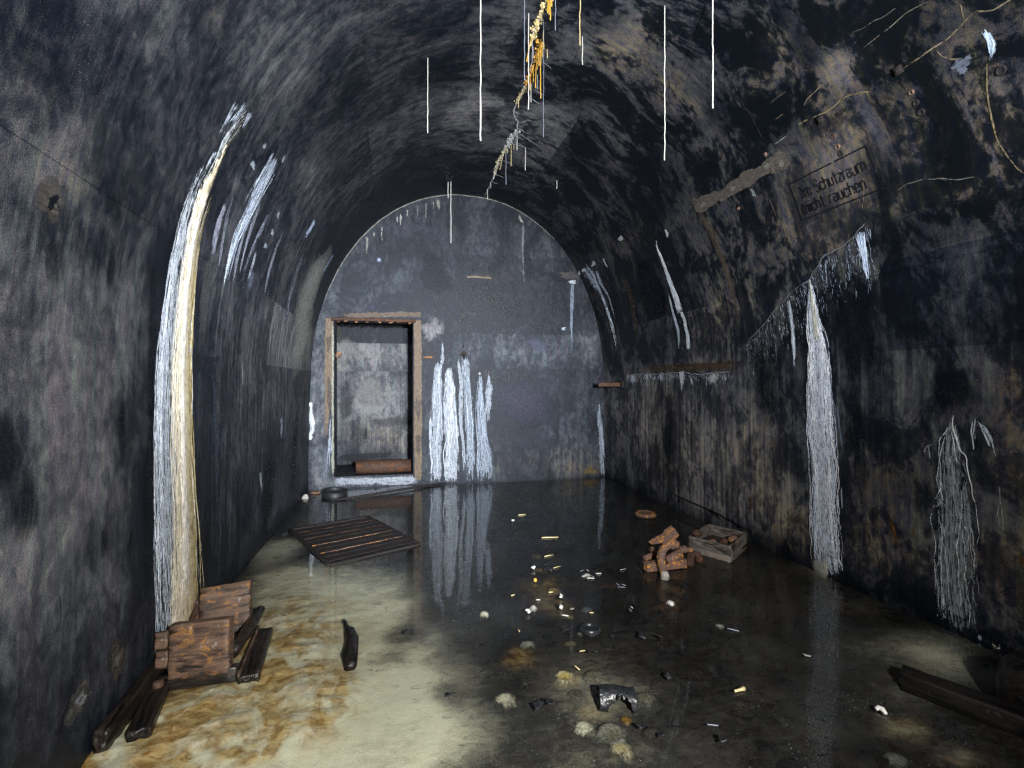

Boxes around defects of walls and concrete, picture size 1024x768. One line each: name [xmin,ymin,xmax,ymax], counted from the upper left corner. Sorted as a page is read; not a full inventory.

crack [855,0,930,47]
crack [906,0,1010,67]
crack [485,0,554,195]
crack [737,83,870,145]
crack [986,64,1024,173]
crack [898,177,973,190]
damp [570,258,617,346]
damp [624,241,690,349]
damp [146,103,276,632]
damp [423,319,540,482]
damp [787,280,864,579]
damp [924,417,1016,656]